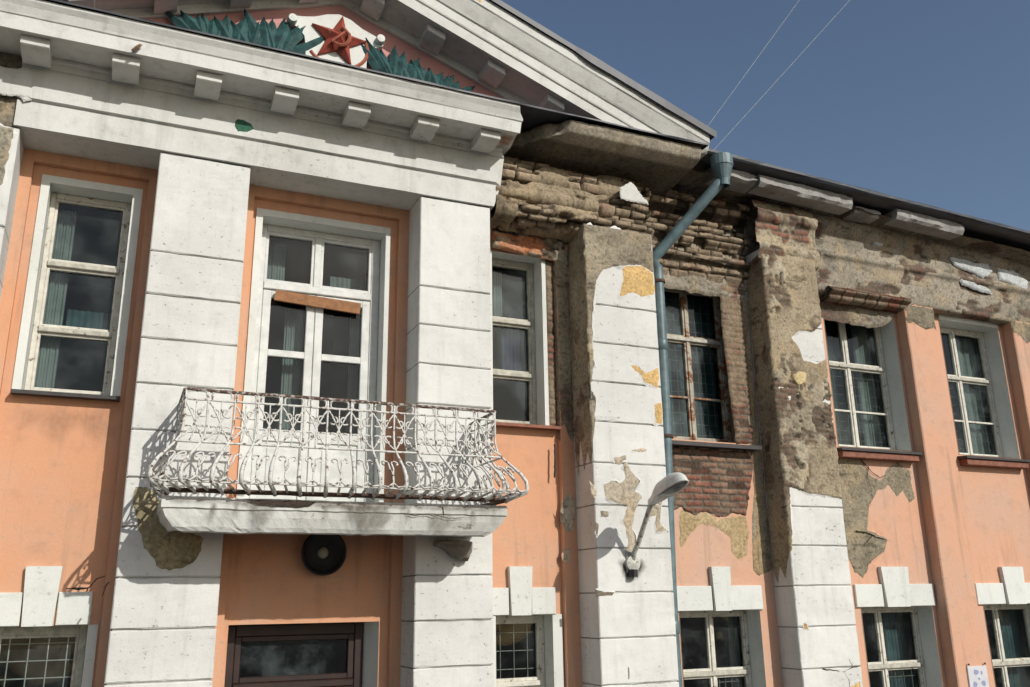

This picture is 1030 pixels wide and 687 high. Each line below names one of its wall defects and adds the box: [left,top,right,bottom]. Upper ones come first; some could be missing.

flaking render [0,123,18,185]
peeling [950,257,1028,294]
flaking render [492,216,946,582]
flaking render [130,482,203,574]